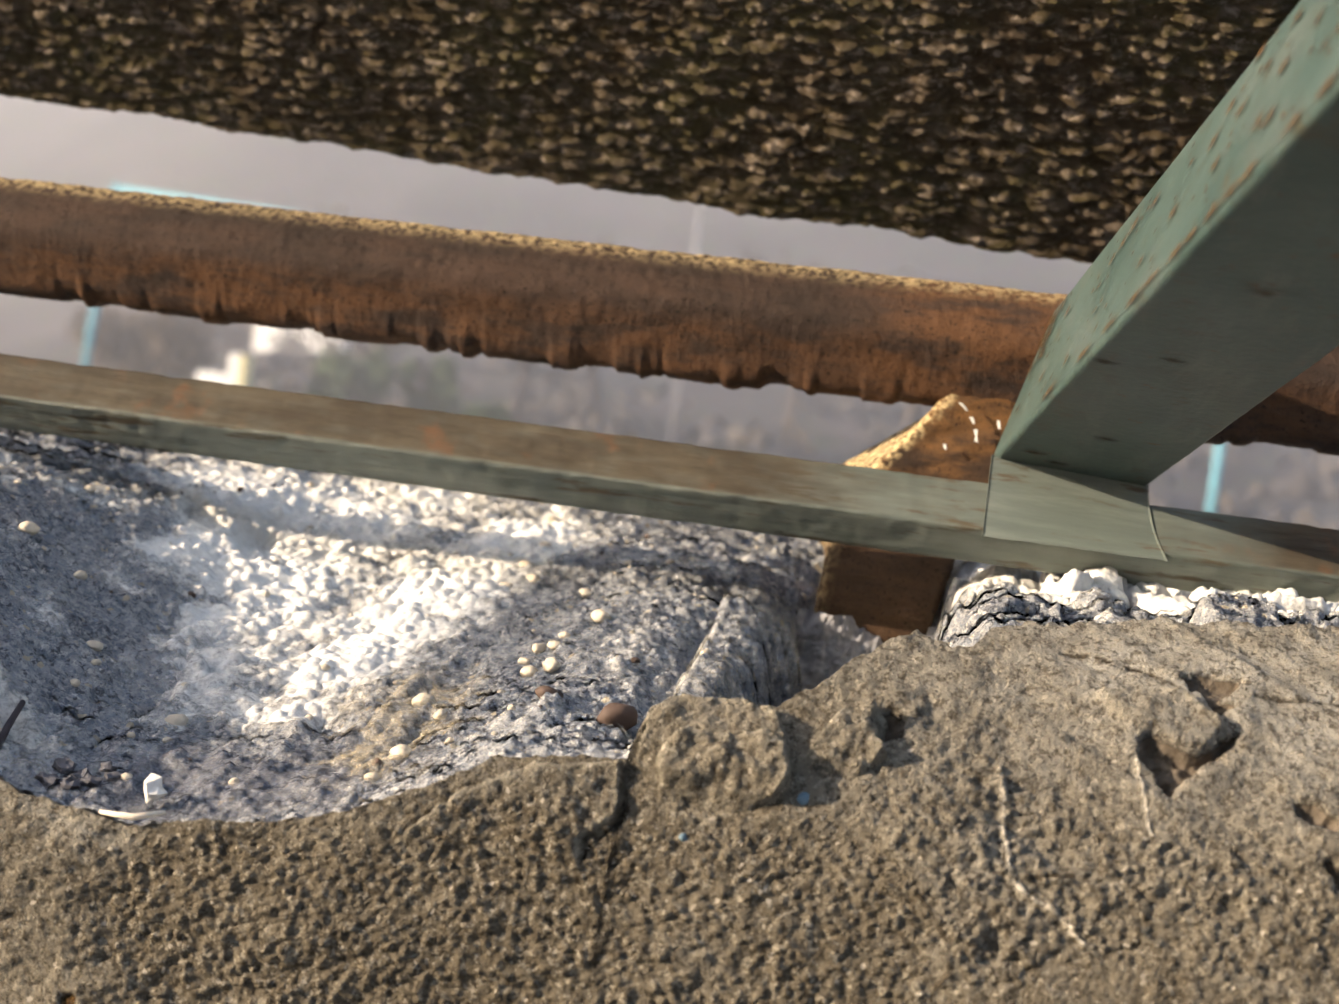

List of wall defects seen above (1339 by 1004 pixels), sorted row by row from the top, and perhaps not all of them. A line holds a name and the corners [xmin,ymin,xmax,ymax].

rust [1016,161,1256,411]
spalling [931,559,1339,647]
spalling [0,428,905,873]
crack [578,803,627,885]
spalling [1295,804,1339,832]
spalling [1325,861,1339,891]